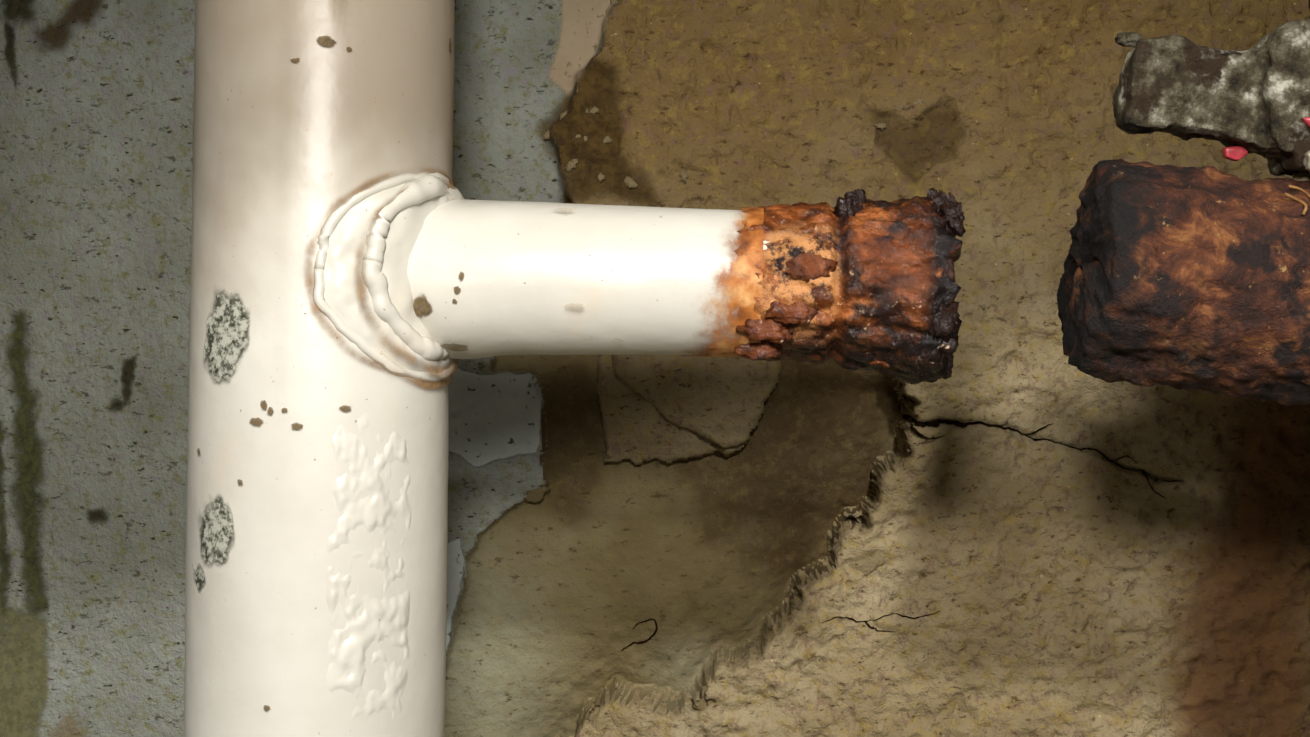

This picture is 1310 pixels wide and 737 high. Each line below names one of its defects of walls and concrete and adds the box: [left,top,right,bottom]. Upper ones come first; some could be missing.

damp [3,0,33,85]
damp [39,0,101,48]
peeling [1115,32,1142,48]
spalling [541,0,656,203]
crack [902,414,1177,498]
damp [0,314,47,737]
spalling [445,354,914,737]
crack [621,619,658,651]
crack [822,611,939,632]